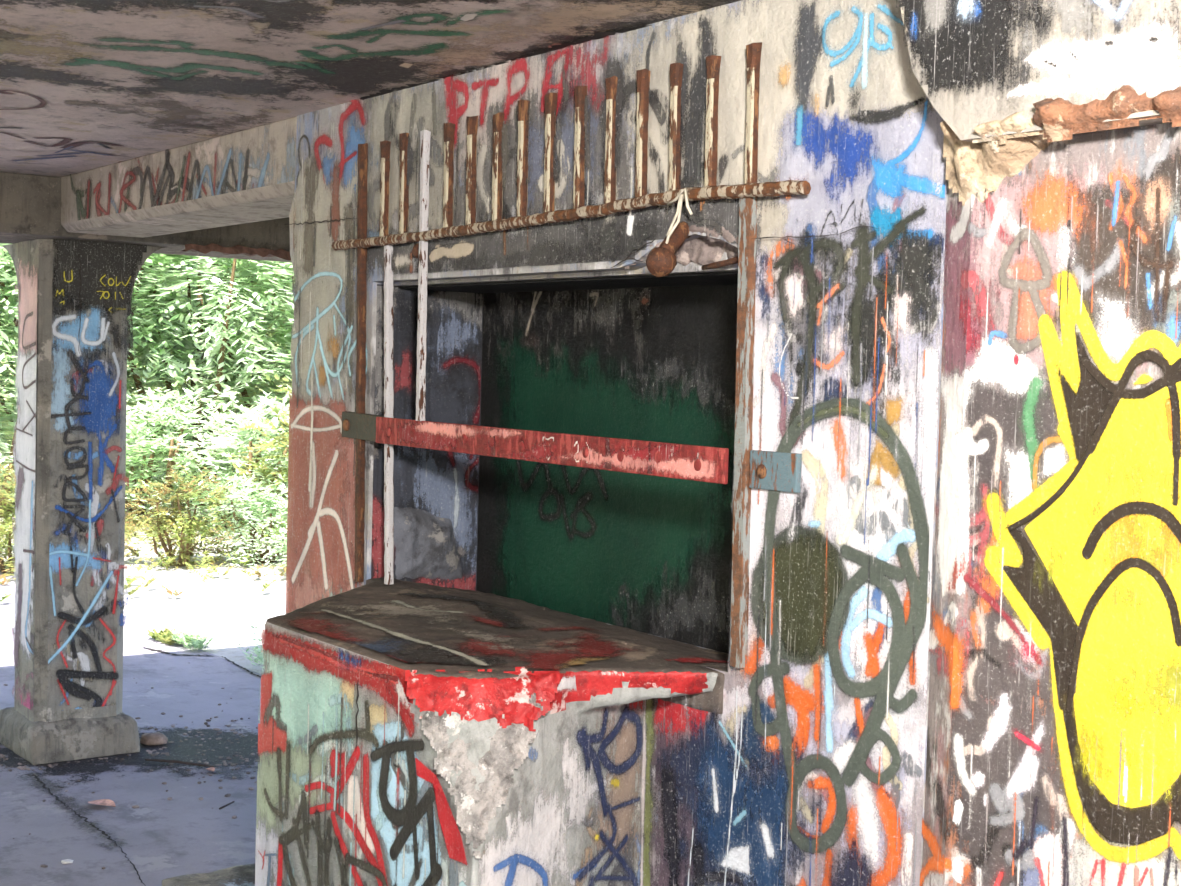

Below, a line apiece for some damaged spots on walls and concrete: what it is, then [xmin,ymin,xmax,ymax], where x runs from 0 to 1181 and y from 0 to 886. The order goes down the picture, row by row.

crack [360,21,668,100]
corrosion [778,63,791,87]
peeling [940,19,1181,206]
peeling [374,286,416,415]
peeling [427,291,482,425]
spalling [289,445,638,858]
crack [30,773,145,885]